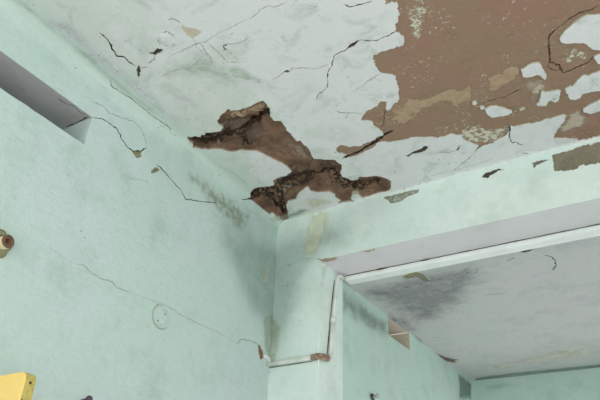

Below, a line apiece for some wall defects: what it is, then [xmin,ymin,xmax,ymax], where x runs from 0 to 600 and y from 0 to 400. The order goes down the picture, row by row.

crack [100,1,288,76]
crack [274,31,396,97]
crack [59,99,146,152]
peeling [187,0,600,221]
crack [155,164,217,203]
crack [53,250,262,353]